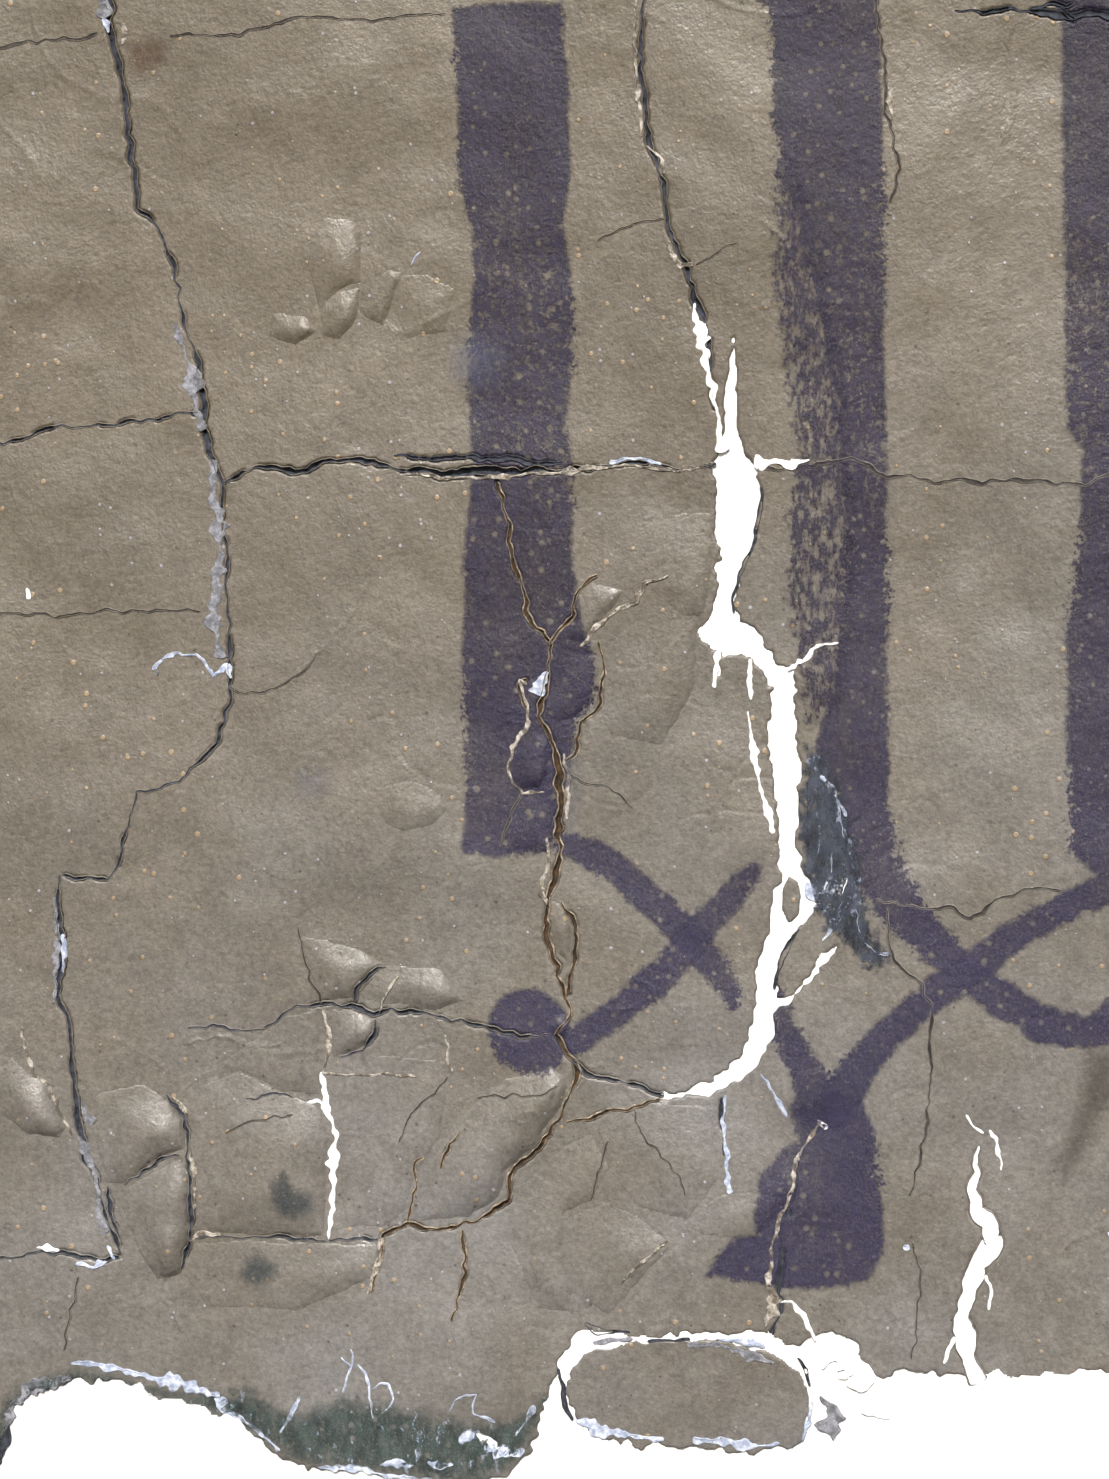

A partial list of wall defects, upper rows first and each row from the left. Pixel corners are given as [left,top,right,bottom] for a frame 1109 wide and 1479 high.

crack [873,0,902,203]
crack [955,0,1109,35]
crack [754,455,1109,487]
crack [0,0,737,1351]
flaking render [661,338,847,1099]
crack [875,886,1060,1197]
crack [761,1074,828,1341]
crack [910,1115,1004,1385]
flaking render [0,1360,453,1479]
flaking render [459,1322,1109,1479]